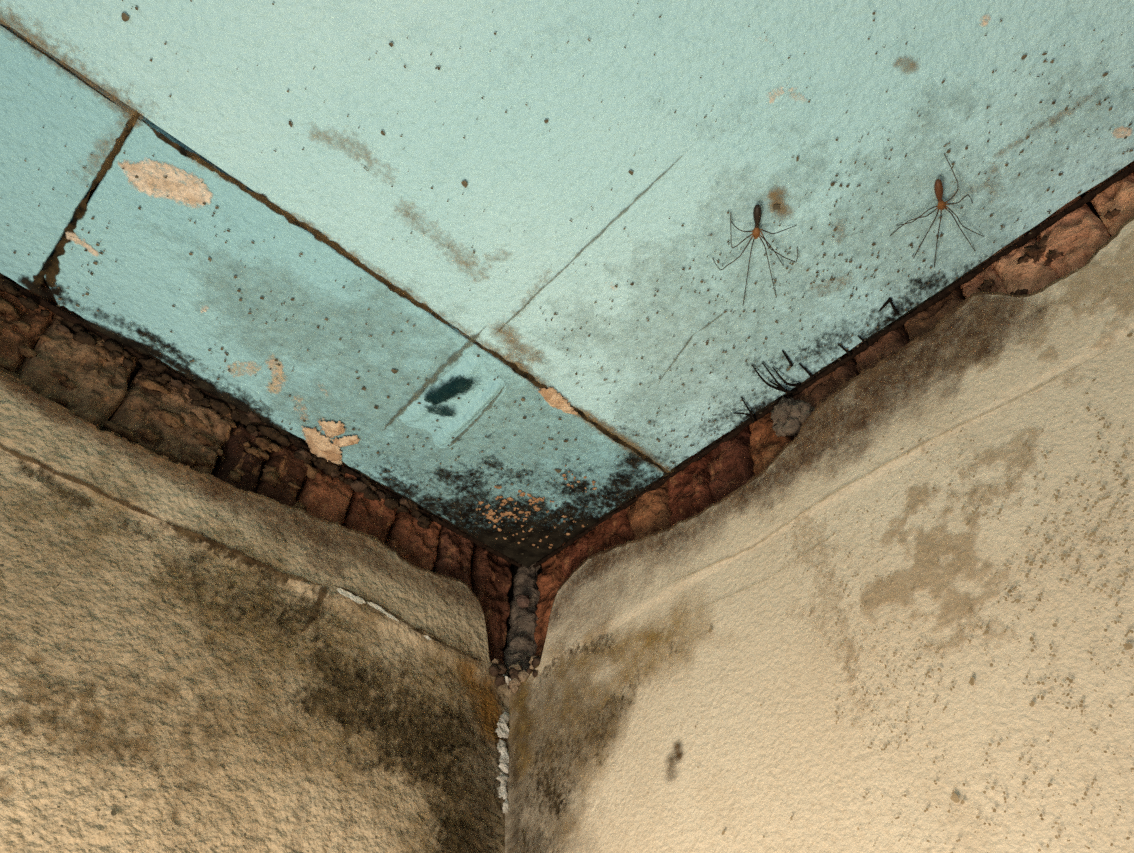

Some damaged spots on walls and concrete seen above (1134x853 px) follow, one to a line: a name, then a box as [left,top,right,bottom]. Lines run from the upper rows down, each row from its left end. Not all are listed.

crack [0,445,484,662]
water stain [0,372,679,853]
crack [0,24,1134,568]
flaking render [0,159,1134,693]
water stain [353,128,1031,568]
water stain [553,294,1134,853]